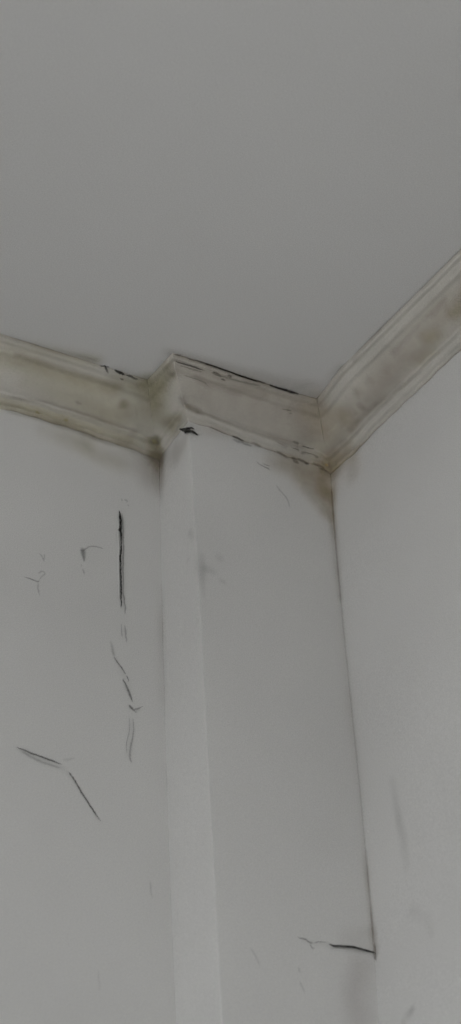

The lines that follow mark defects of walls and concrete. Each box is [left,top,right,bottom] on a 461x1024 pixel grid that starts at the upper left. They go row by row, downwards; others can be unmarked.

crack [177,355,298,394]
crack [115,511,123,606]
crack [17,747,100,820]
crack [301,938,376,955]